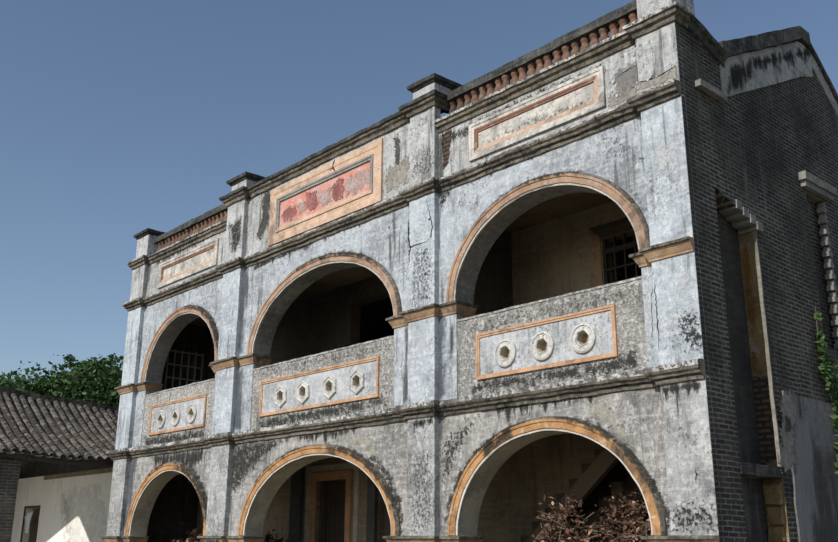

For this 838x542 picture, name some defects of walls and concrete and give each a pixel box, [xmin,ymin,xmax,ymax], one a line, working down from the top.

peeling [608,64,639,107]
damp [728,47,811,95]
flaking render [441,130,451,170]
damp [229,218,249,254]
crack [408,199,433,275]
crack [651,282,659,346]
damp [472,349,638,393]
mould [258,395,388,428]
damp [662,380,700,410]
damp [229,428,403,533]
damp [413,396,670,532]